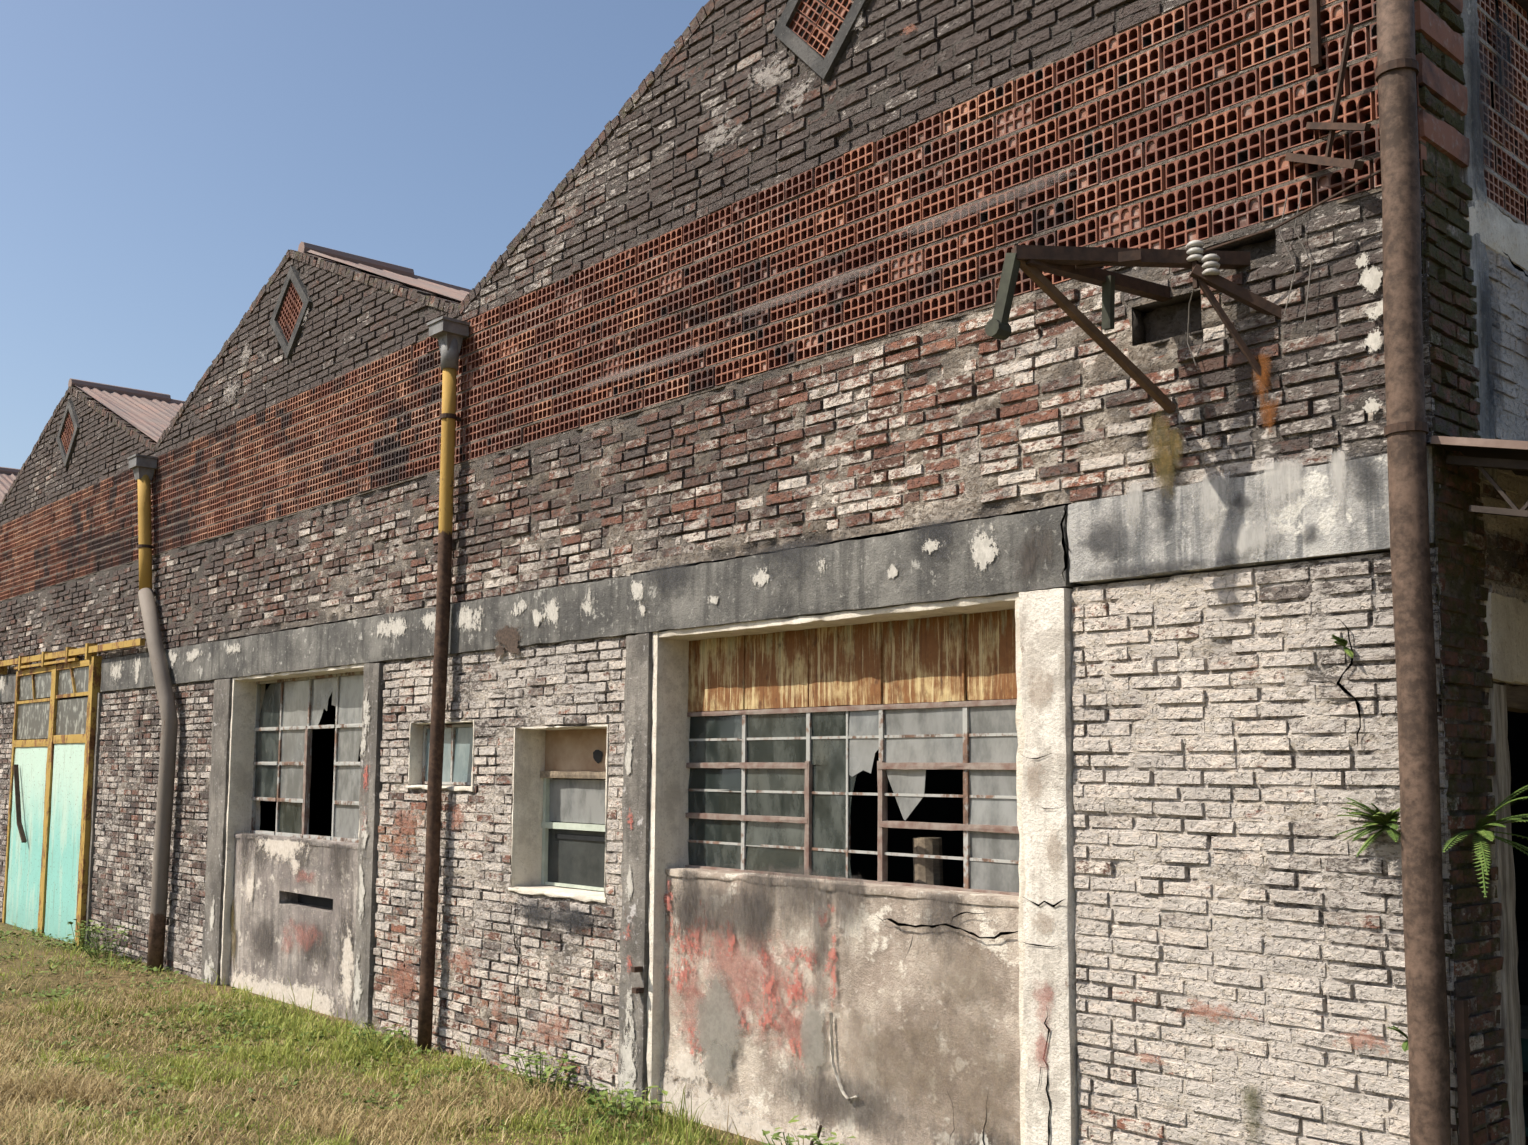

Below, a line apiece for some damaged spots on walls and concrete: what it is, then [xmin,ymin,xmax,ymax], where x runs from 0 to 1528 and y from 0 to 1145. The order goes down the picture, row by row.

corrosion [1255,354,1277,428]
damp [1193,473,1276,553]
damp [1264,460,1301,508]
damp [1331,452,1373,507]
damp [230,832,354,1016]
damp [674,867,863,964]
damp [922,894,958,939]
crack [876,897,1065,958]
spalling [662,881,858,1099]
damp [659,1050,889,1145]
crack [947,1090,989,1145]
crack [1037,1006,1051,1145]